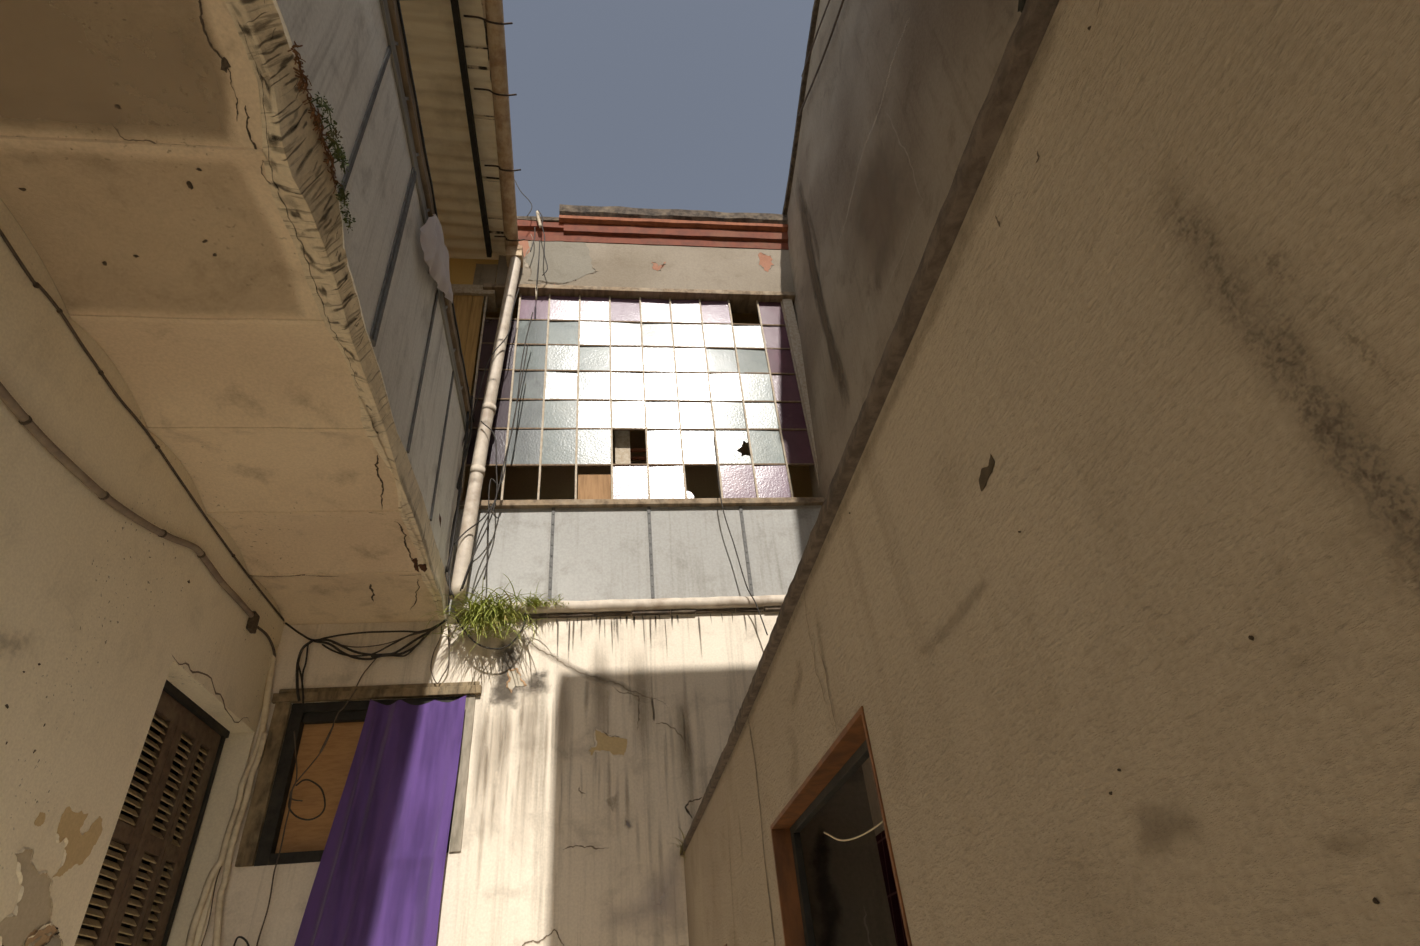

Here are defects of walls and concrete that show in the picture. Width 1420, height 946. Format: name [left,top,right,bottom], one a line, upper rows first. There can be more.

crack [198,0,271,184]
crack [250,455,421,610]
leakage [491,615,678,720]
peeling [588,728,627,757]
peeling [0,806,103,946]
crack [522,929,564,946]